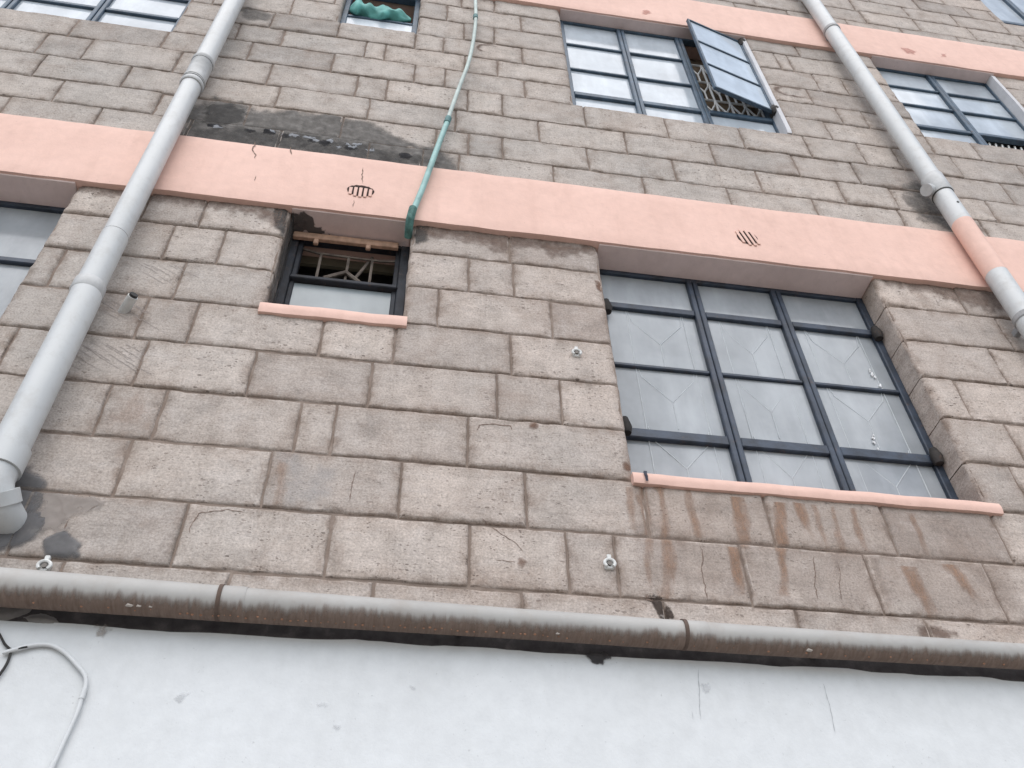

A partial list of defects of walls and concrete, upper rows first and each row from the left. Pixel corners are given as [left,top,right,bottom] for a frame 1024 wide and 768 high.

water stain [181,97,456,170]
rust [775,502,807,575]
crack [700,547,708,601]
crack [813,558,842,599]
rust [903,566,926,600]